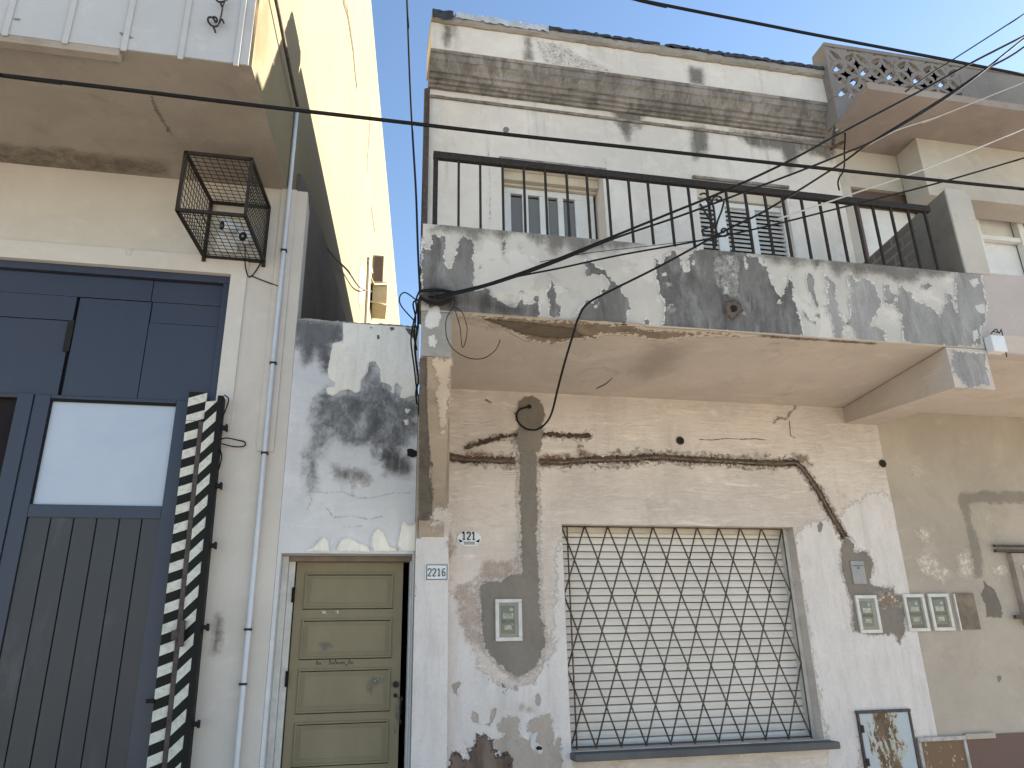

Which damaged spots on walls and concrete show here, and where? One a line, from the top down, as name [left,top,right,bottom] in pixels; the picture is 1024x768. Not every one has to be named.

leakage [690,67,703,84]
leakage [0,148,158,173]
leakage [295,320,342,369]
peeling [326,233,991,435]
leakage [314,368,418,473]
crack [429,406,855,546]
peeling [306,520,415,552]
peeling [470,692,564,768]